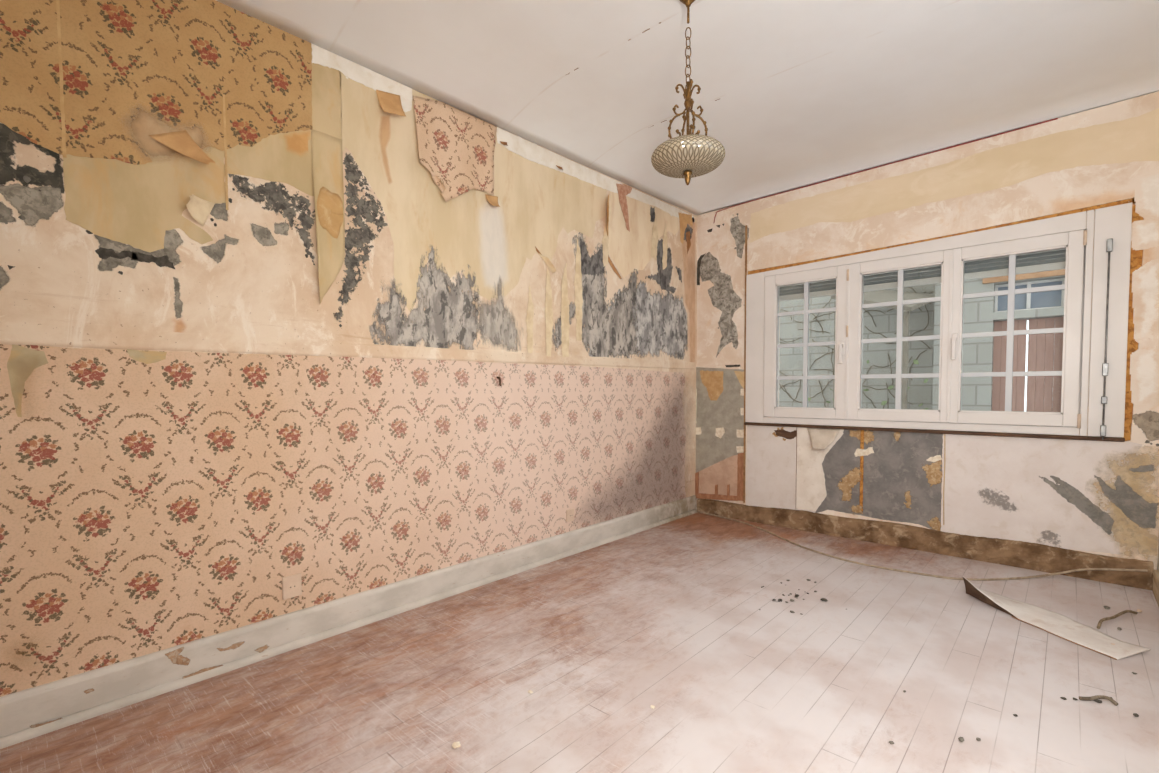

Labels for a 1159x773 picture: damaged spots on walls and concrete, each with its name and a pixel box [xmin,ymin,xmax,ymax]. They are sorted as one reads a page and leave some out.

peeling [0,265,14,289]
peeling [0,123,65,226]
peeling [86,229,183,318]
peeling [201,174,315,265]
peeling [333,153,388,327]
peeling [370,127,694,359]
peeling [707,213,749,258]
peeling [700,252,744,401]
peeling [746,169,1159,555]
peeling [165,647,223,679]
peeling [217,641,269,653]